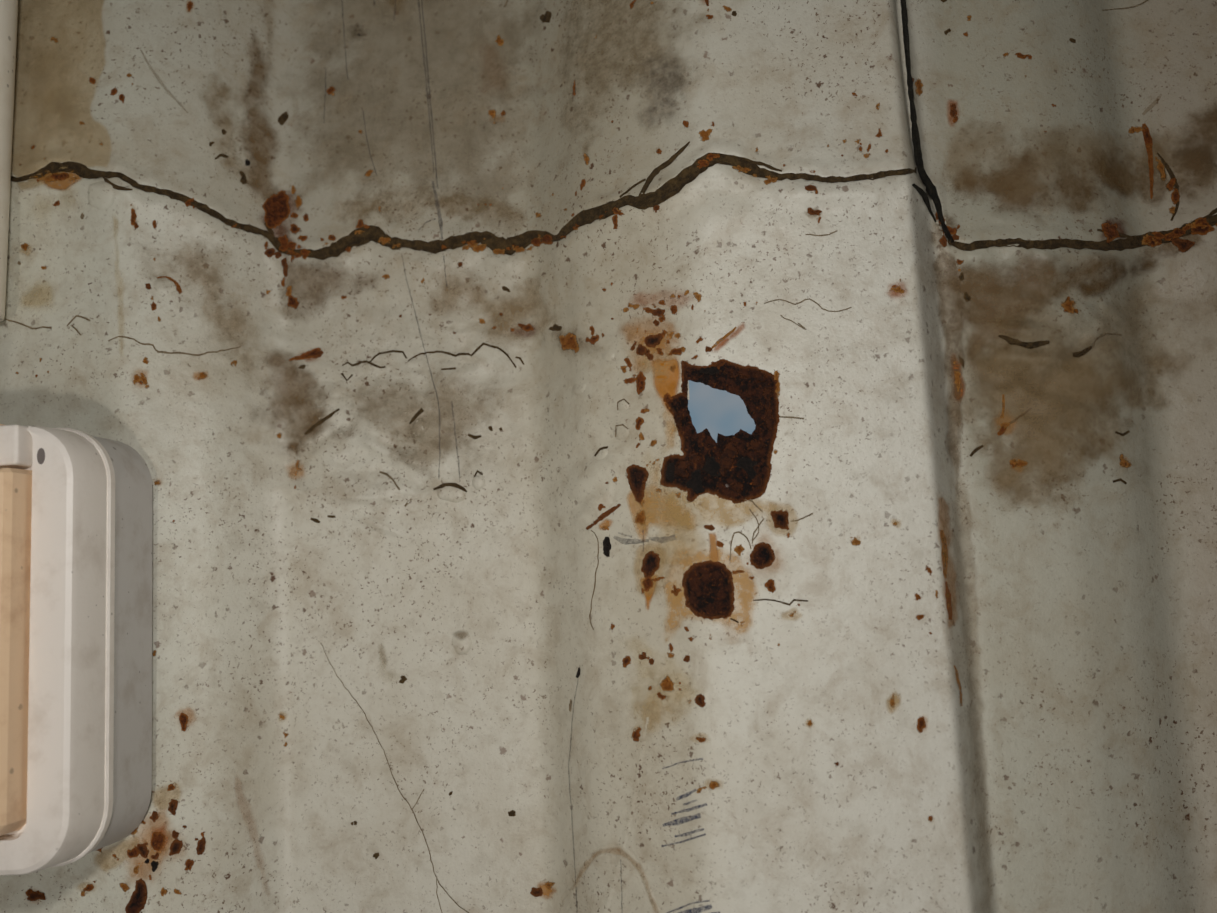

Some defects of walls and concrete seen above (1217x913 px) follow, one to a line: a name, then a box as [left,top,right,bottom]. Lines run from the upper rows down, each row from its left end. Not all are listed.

crack [11,0,1217,260]
water stain [957,134,1071,206]
corrosion [262,185,336,309]
corrosion [549,324,604,353]
corrosion [611,290,780,534]
crack [764,298,852,330]
water stain [935,257,1153,486]
corrosion [603,537,611,557]
corrosion [641,525,776,662]
corrosion [771,510,790,538]
corrosion [648,675,706,707]
corrosion [97,784,206,913]